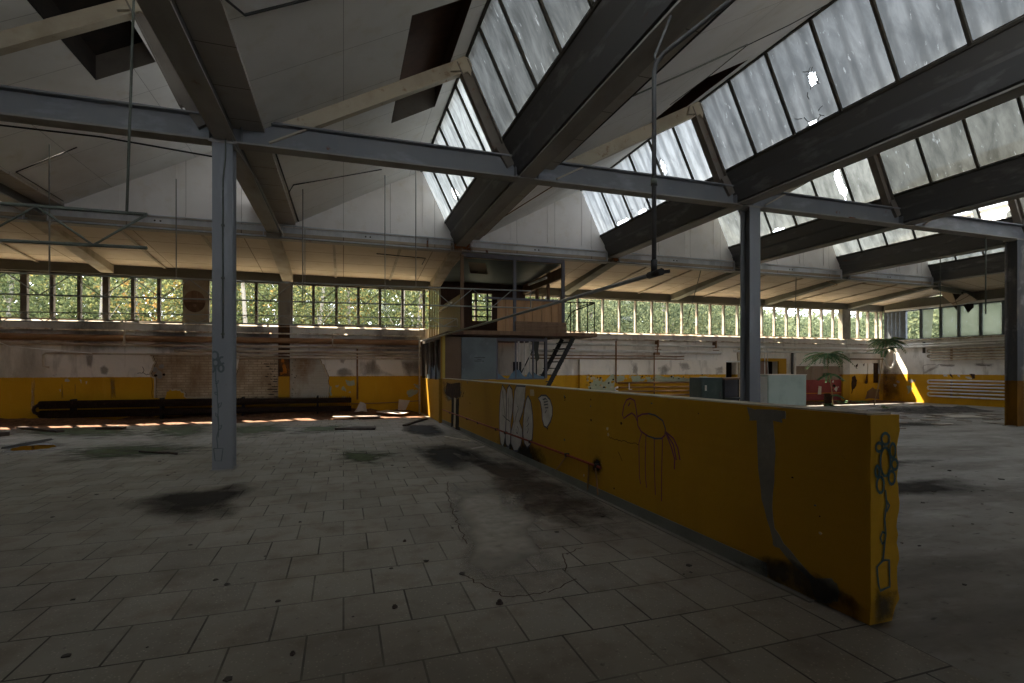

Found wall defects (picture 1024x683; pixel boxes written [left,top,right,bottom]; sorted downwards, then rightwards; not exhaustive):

leakage [140,486,244,515]
crack [464,548,581,597]
leakage [758,558,856,620]